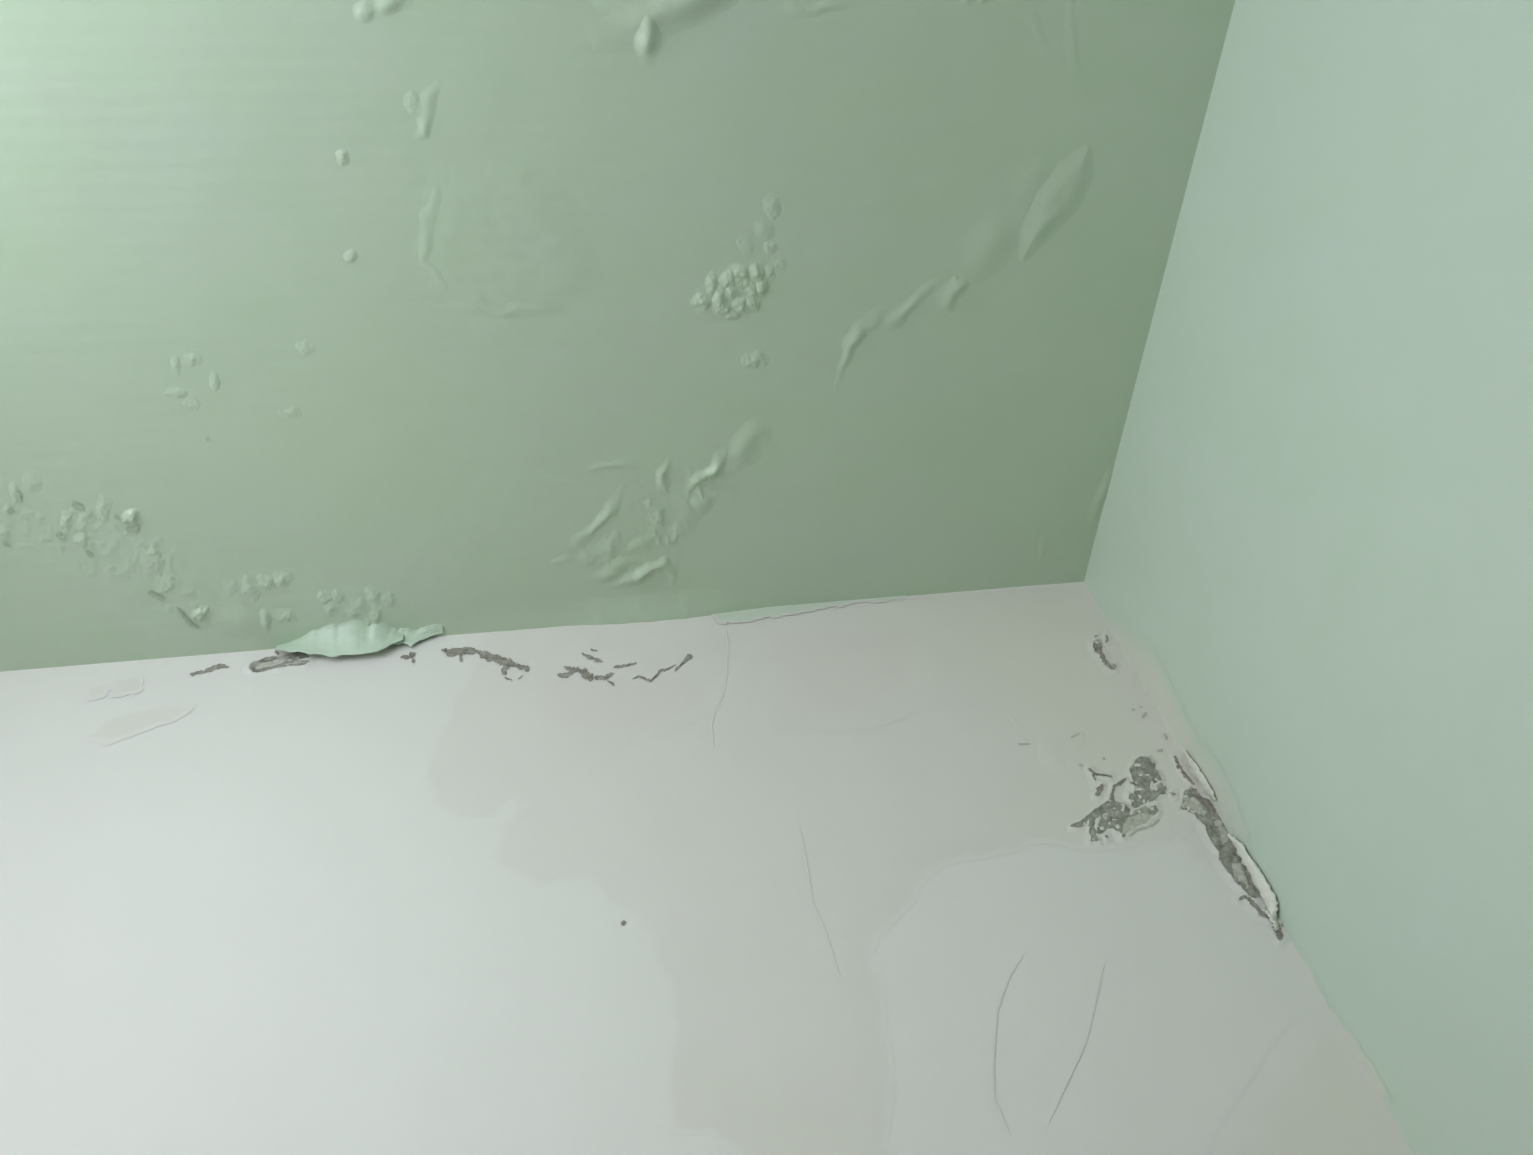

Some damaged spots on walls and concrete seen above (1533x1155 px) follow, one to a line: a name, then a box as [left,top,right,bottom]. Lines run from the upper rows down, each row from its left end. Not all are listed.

peeling [241,619,444,678]
flaking render [1066,612,1290,950]